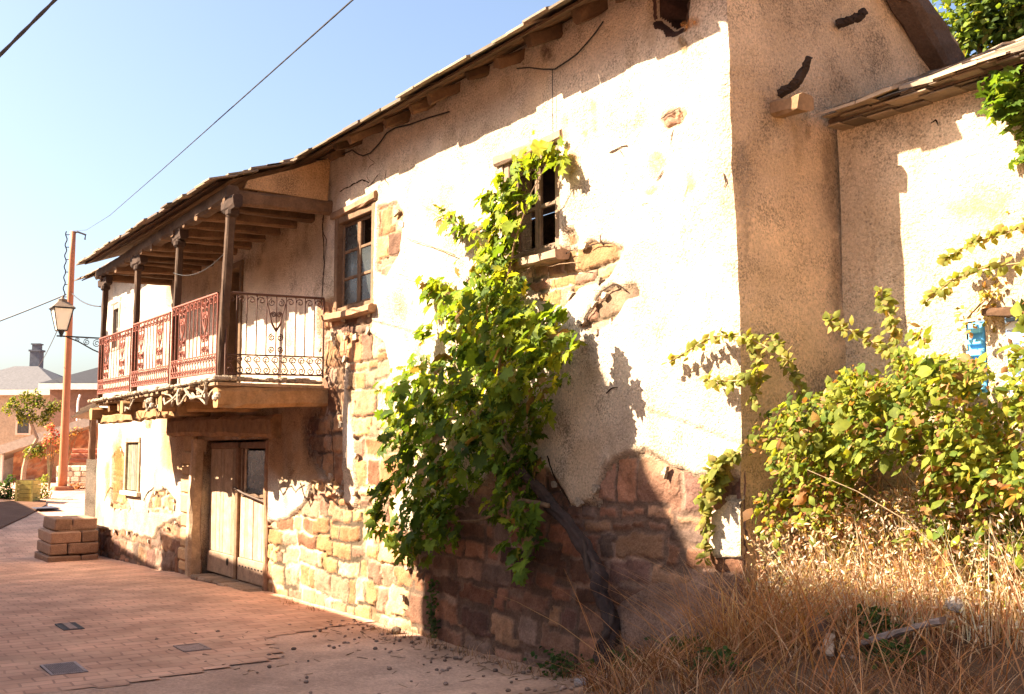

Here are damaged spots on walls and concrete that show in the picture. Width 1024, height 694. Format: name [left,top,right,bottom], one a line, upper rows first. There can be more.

spalling [664,111,687,128]
spalling [377,203,404,276]
spalling [519,234,640,336]
spalling [110,446,131,512]
spalling [99,485,185,574]
spalling [267,301,748,674]